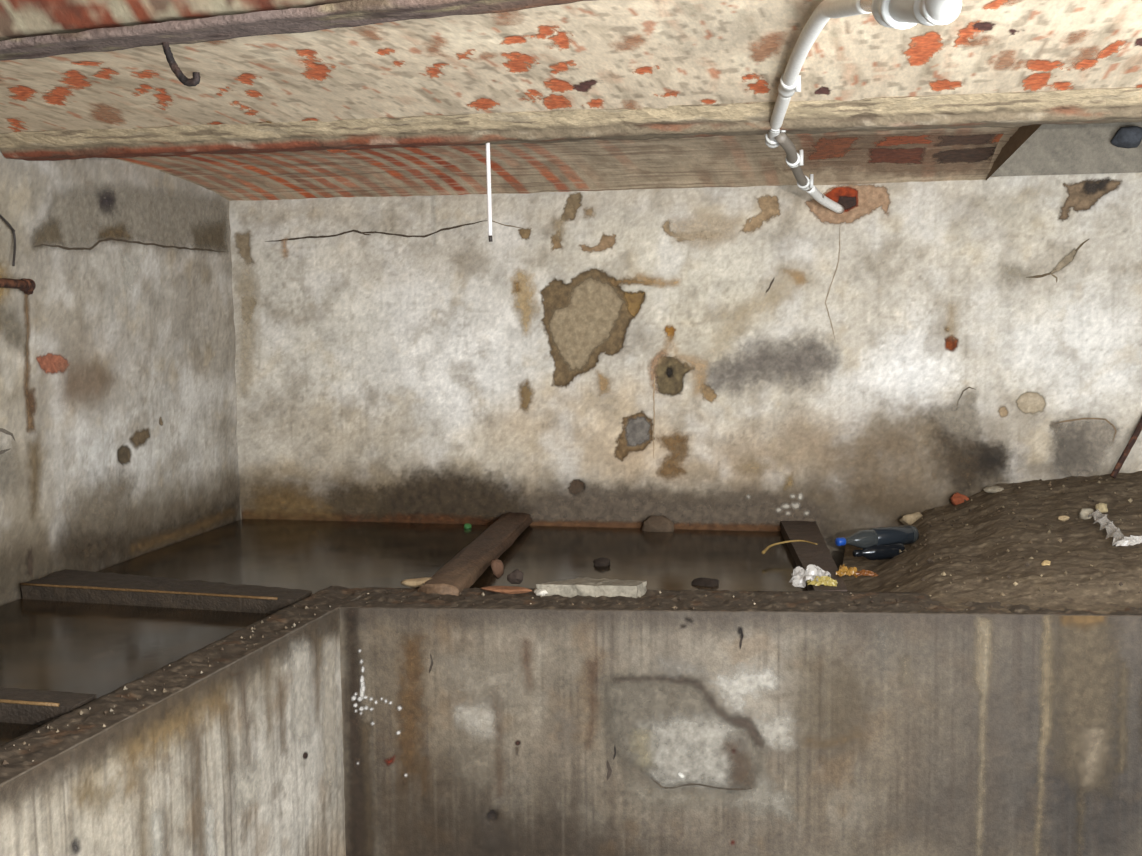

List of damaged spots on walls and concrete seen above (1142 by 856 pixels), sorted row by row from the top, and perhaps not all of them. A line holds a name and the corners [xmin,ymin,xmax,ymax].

spalling [1059,179,1121,221]
crack [265,221,524,256]
crack [1005,239,1089,283]
rust [0,269,35,432]
spalling [540,269,654,387]
spalling [649,351,694,396]
crack [0,428,15,487]
rust [30,444,39,514]
leakage [250,470,830,536]
spalling [614,411,655,461]
leakage [659,434,688,478]
leakage [0,608,374,856]